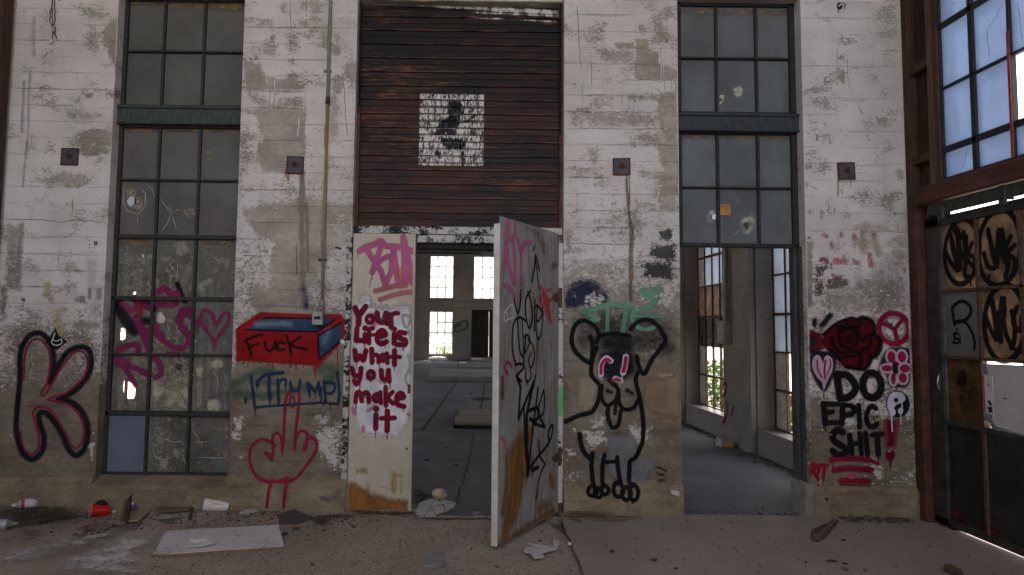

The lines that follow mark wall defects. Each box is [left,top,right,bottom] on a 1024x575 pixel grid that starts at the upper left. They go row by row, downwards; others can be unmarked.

peeling [416,5,557,22]
peeling [228,1,355,487]
corrosion [613,158,634,302]
corrosion [837,162,856,195]